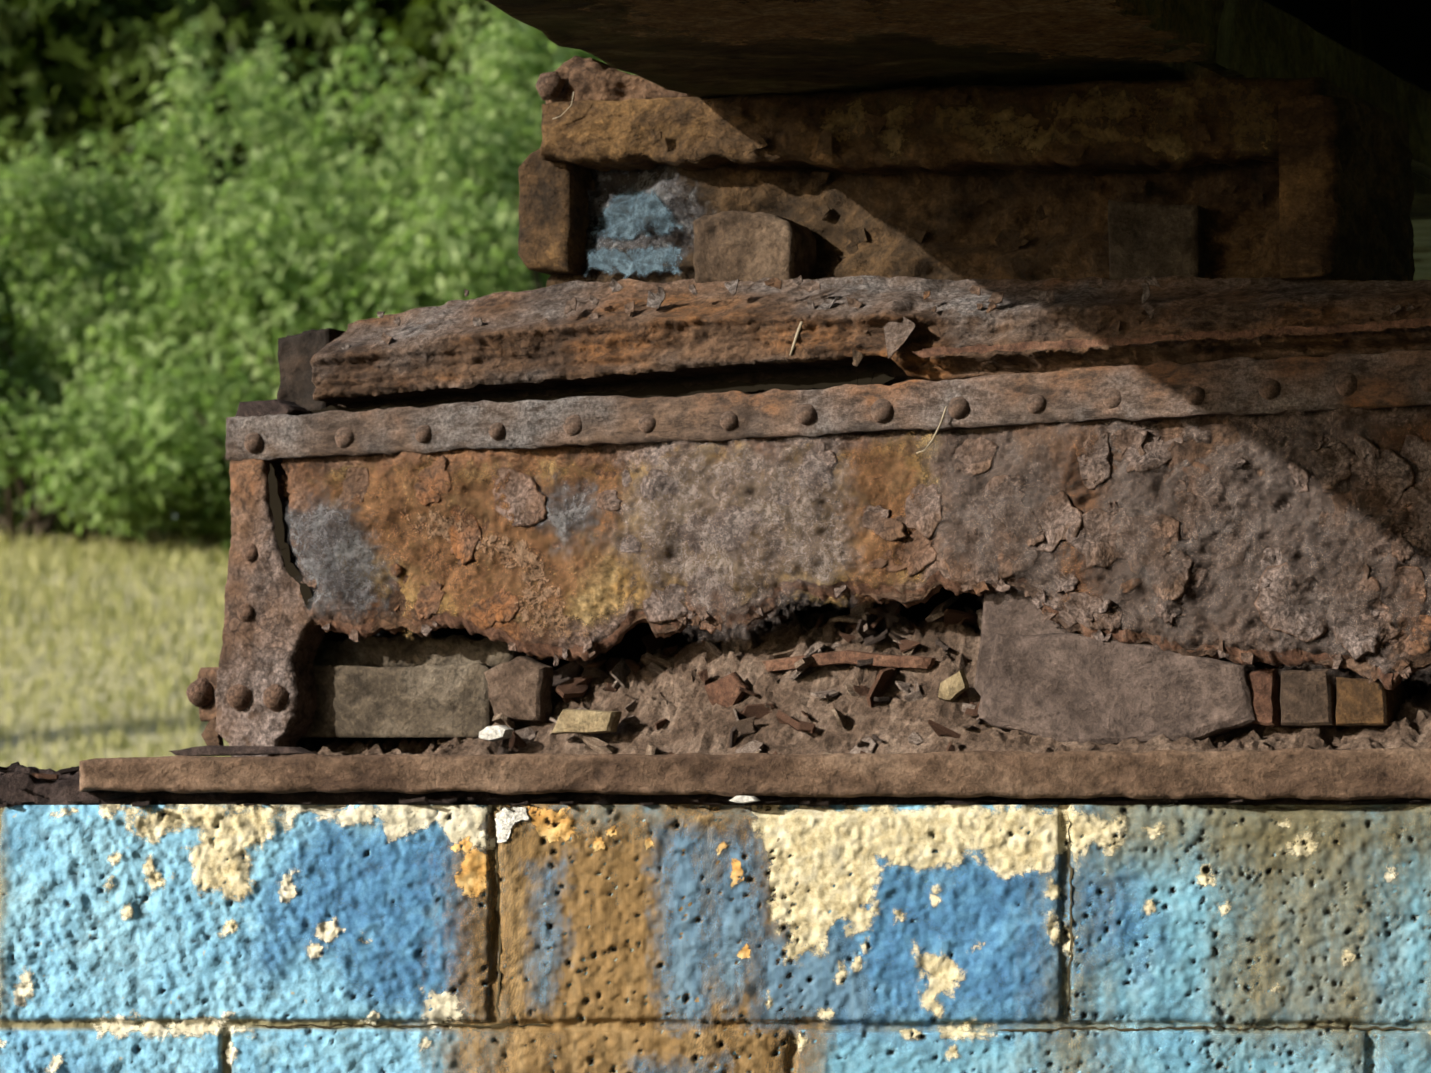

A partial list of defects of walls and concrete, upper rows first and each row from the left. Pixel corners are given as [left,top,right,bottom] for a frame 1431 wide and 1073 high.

rust [235,399,310,417]
crack [309,370,894,414]
rust [310,465,621,643]
peeling [642,583,728,635]
rust [938,669,969,701]
rust [169,717,316,756]
peeling [99,804,496,903]
peeling [752,805,1127,985]
peeling [304,918,370,960]
rust [399,797,826,1073]
peeling [818,1008,835,1020]
peeling [912,941,994,1059]